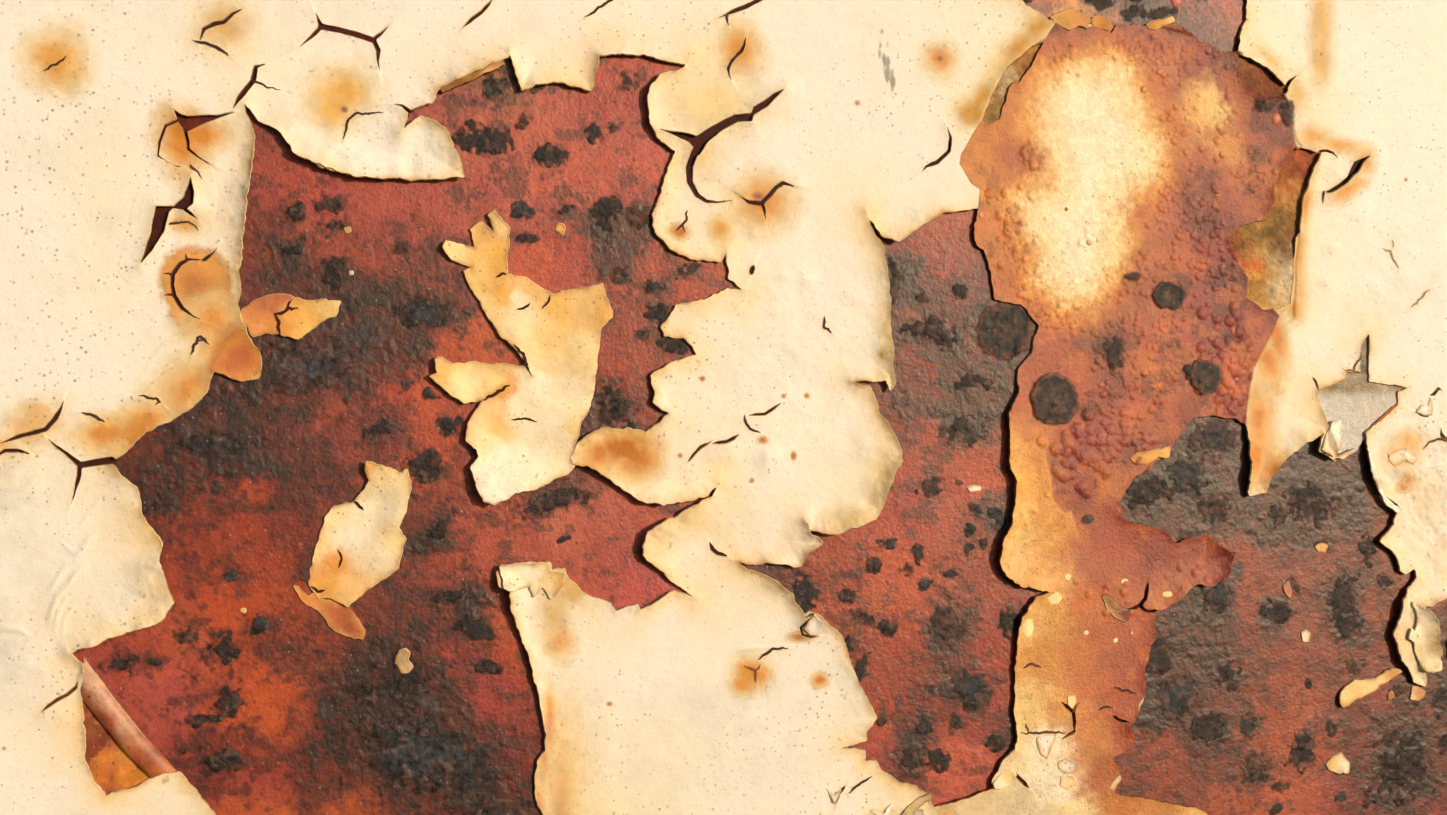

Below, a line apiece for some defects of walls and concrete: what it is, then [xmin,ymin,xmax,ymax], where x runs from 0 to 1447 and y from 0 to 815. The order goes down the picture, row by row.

corrosion [156,107,230,178]
crack [142,11,281,355]
crack [306,14,385,66]
crack [653,90,793,232]
peeling [1023,0,1287,97]
crack [0,403,119,498]
corrosion [0,213,261,458]
peeling [73,55,740,815]
peeling [740,209,1047,815]
corrosion [957,0,1375,815]
peeling [1114,336,1447,815]
corrosion [535,692,572,815]